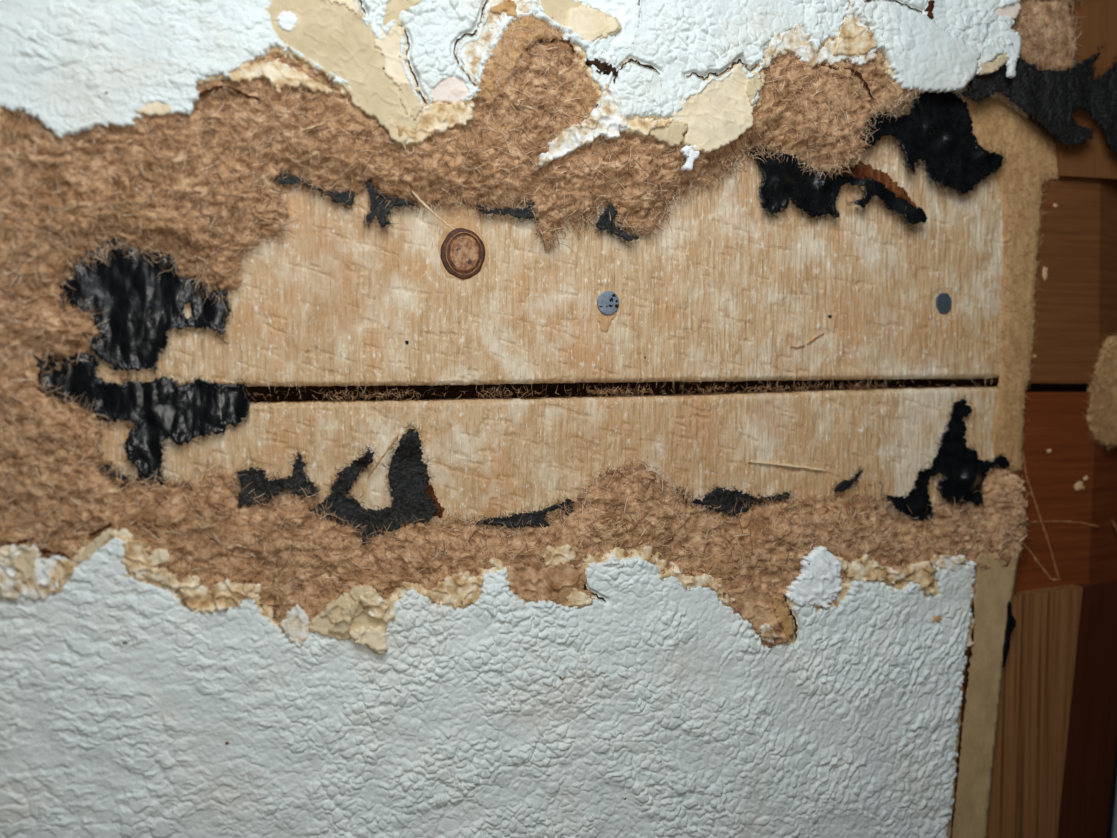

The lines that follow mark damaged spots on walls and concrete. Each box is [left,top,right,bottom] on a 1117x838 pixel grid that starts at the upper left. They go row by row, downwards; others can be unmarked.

peeling [229,0,481,151]
crack [401,0,428,104]
crack [453,0,488,85]
peeling [452,0,764,172]
crack [613,58,659,83]
crack [690,59,757,80]
peeling [977,53,1007,76]
peeling [0,528,260,614]
peeling [278,604,313,645]
spalling [349,565,484,655]
spalling [636,542,736,606]
spalling [836,549,970,598]